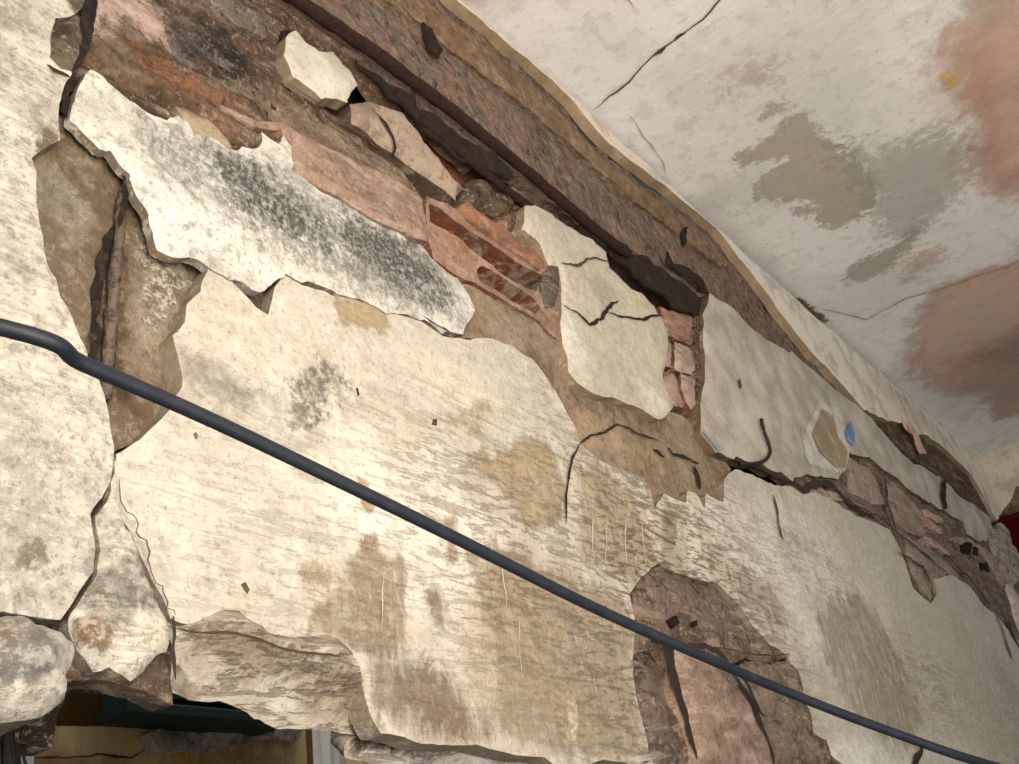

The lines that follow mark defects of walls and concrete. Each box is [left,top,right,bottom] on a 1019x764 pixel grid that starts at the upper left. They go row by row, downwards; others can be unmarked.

spalling [32,0,836,502]
crack [564,300,663,326]
leakage [731,103,882,230]
leakage [842,226,926,283]
peeling [907,263,1019,418]
peeling [934,0,1019,201]
peeling [687,293,1019,641]
crack [0,574,92,625]
spalling [14,385,202,756]
crack [90,479,341,680]
spalling [630,567,842,764]